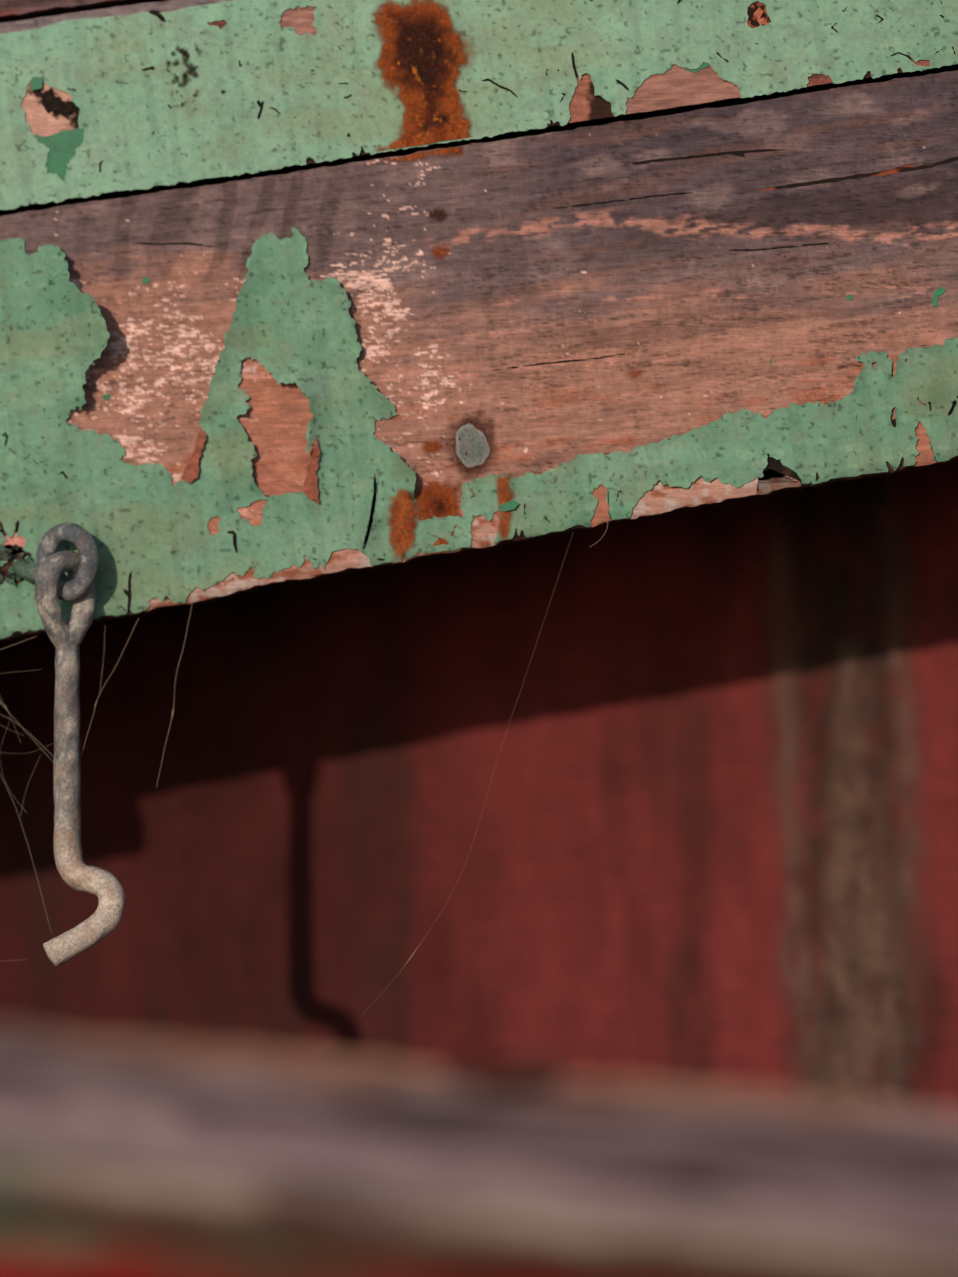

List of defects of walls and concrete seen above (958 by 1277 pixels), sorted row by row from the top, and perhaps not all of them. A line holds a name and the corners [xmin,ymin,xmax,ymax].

peeling [279,6,317,36]
corrosion [373,0,471,161]
hole [747,1,771,29]
peeling [0,59,958,611]
corrosion [389,418,493,557]
corrosion [497,475,520,538]